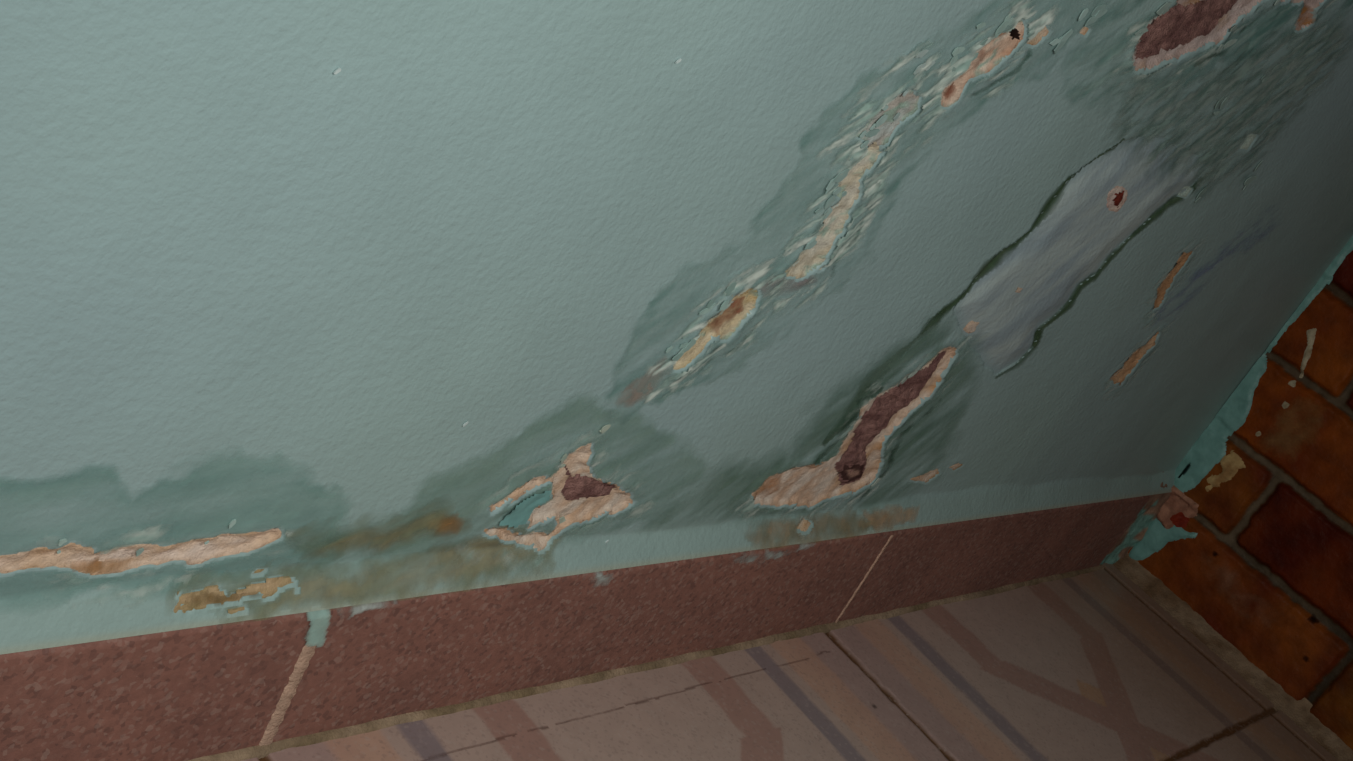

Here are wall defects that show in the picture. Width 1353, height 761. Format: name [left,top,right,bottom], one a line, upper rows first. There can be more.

spalling [1129,0,1337,76]
spalling [646,0,1054,402]
spalling [735,320,979,532]
spalling [0,519,282,583]
spalling [484,424,647,565]
peeling [1170,512,1190,528]
spalling [174,569,293,614]